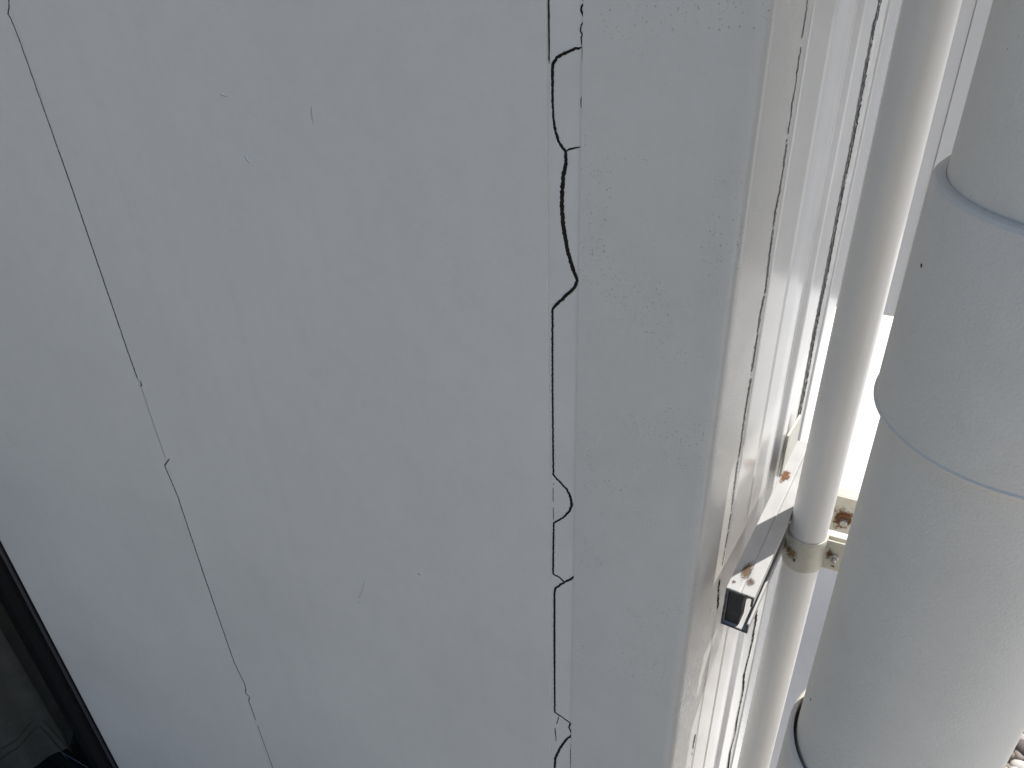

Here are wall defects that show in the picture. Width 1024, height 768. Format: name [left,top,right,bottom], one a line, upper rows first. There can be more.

crack [7,0,273,768]
crack [548,0,583,768]
corrosion [732,561,755,586]